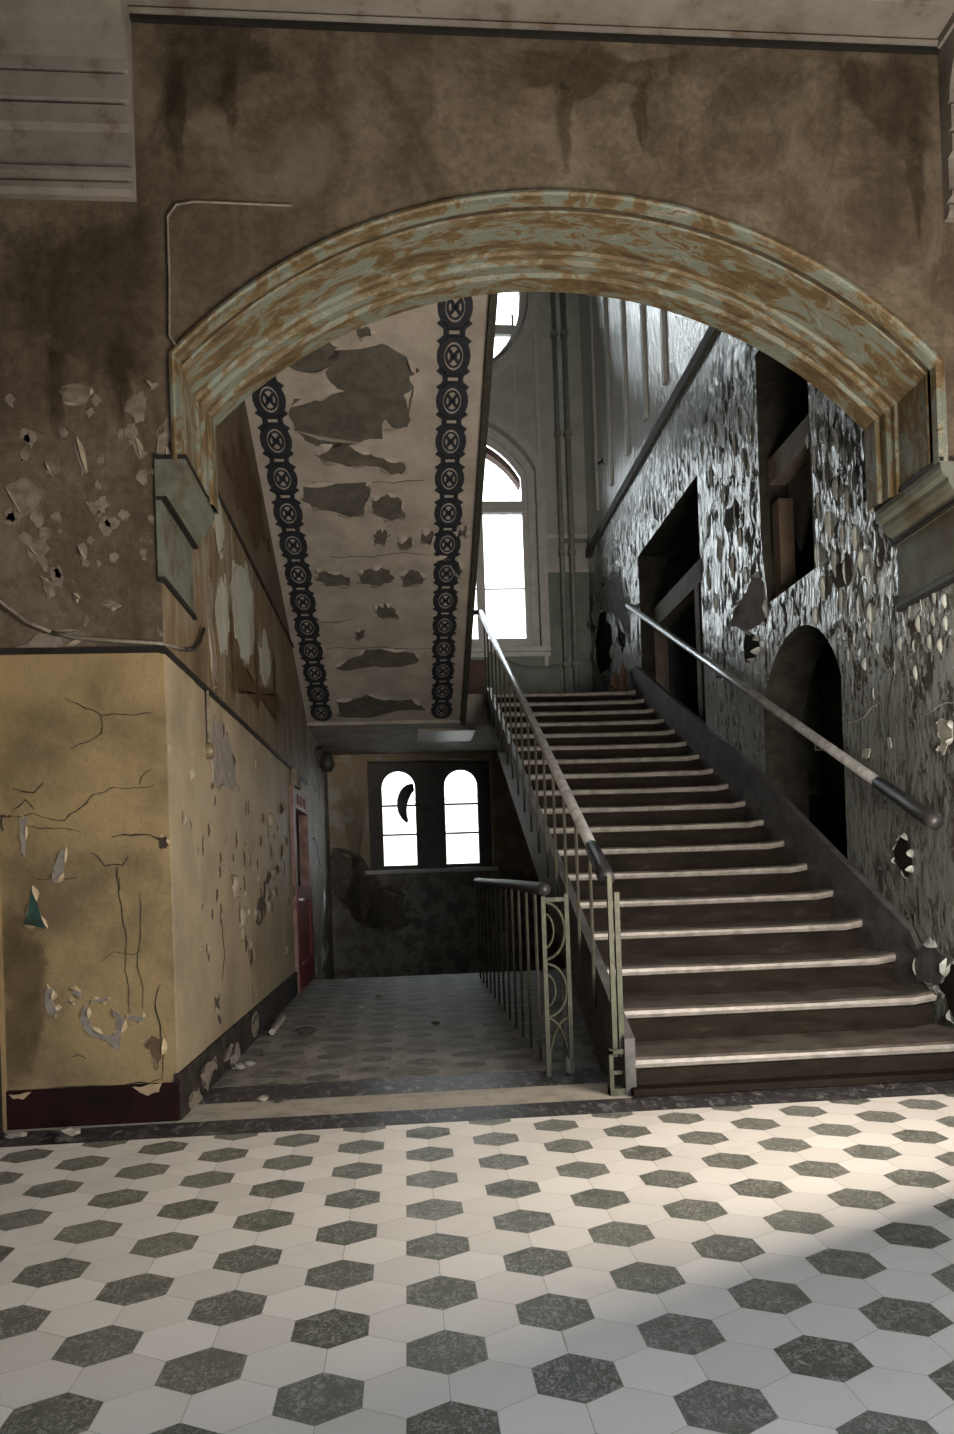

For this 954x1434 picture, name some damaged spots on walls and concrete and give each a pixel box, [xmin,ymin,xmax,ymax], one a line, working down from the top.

peeling [4,426,130,655]
crack [65,698,151,749]
peeling [206,498,271,691]
peeling [288,326,467,672]
spalling [587,610,626,678]
peeling [699,400,750,612]
spalling [738,626,760,663]
peeling [805,413,879,694]
peeling [893,593,948,680]
peeling [936,718,953,755]
crack [0,769,164,1089]
peeling [42,984,167,1095]